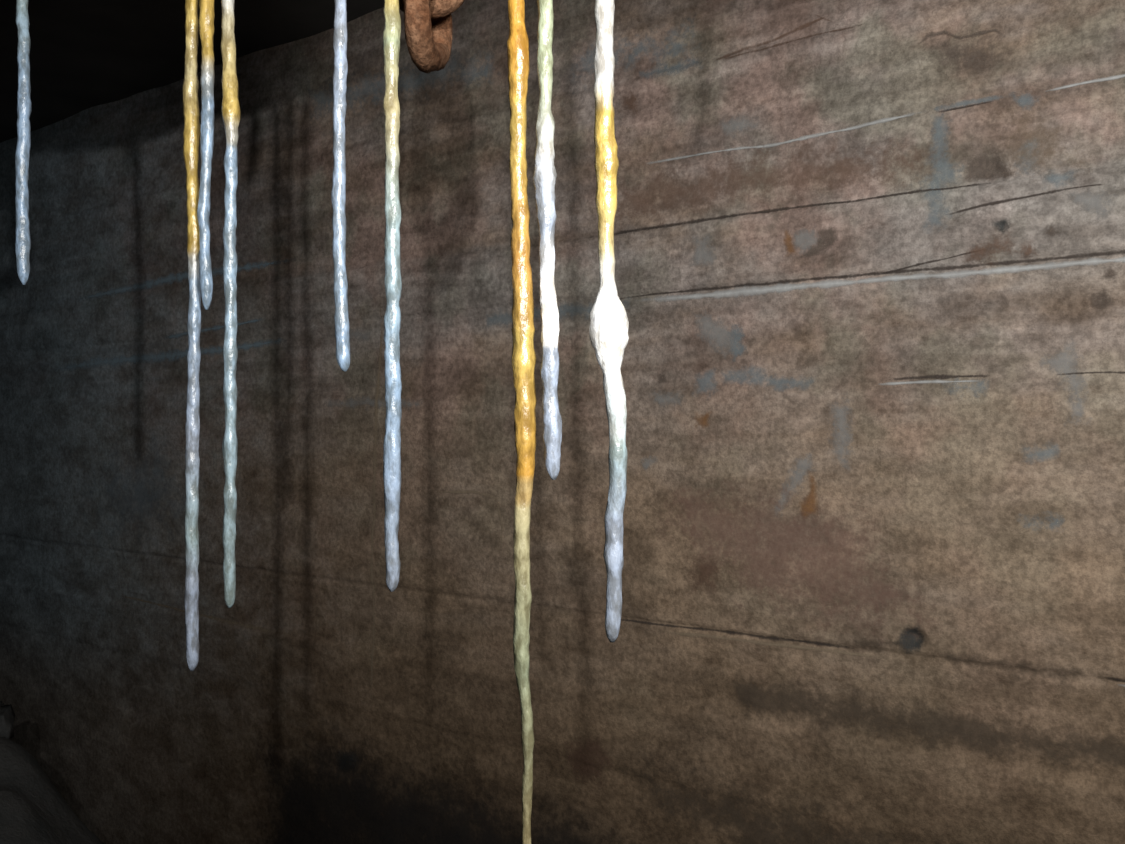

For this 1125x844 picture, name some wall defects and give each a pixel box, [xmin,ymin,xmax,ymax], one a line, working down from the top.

crack [615,184,1101,234]
crack [633,250,1125,300]
crack [623,619,874,657]